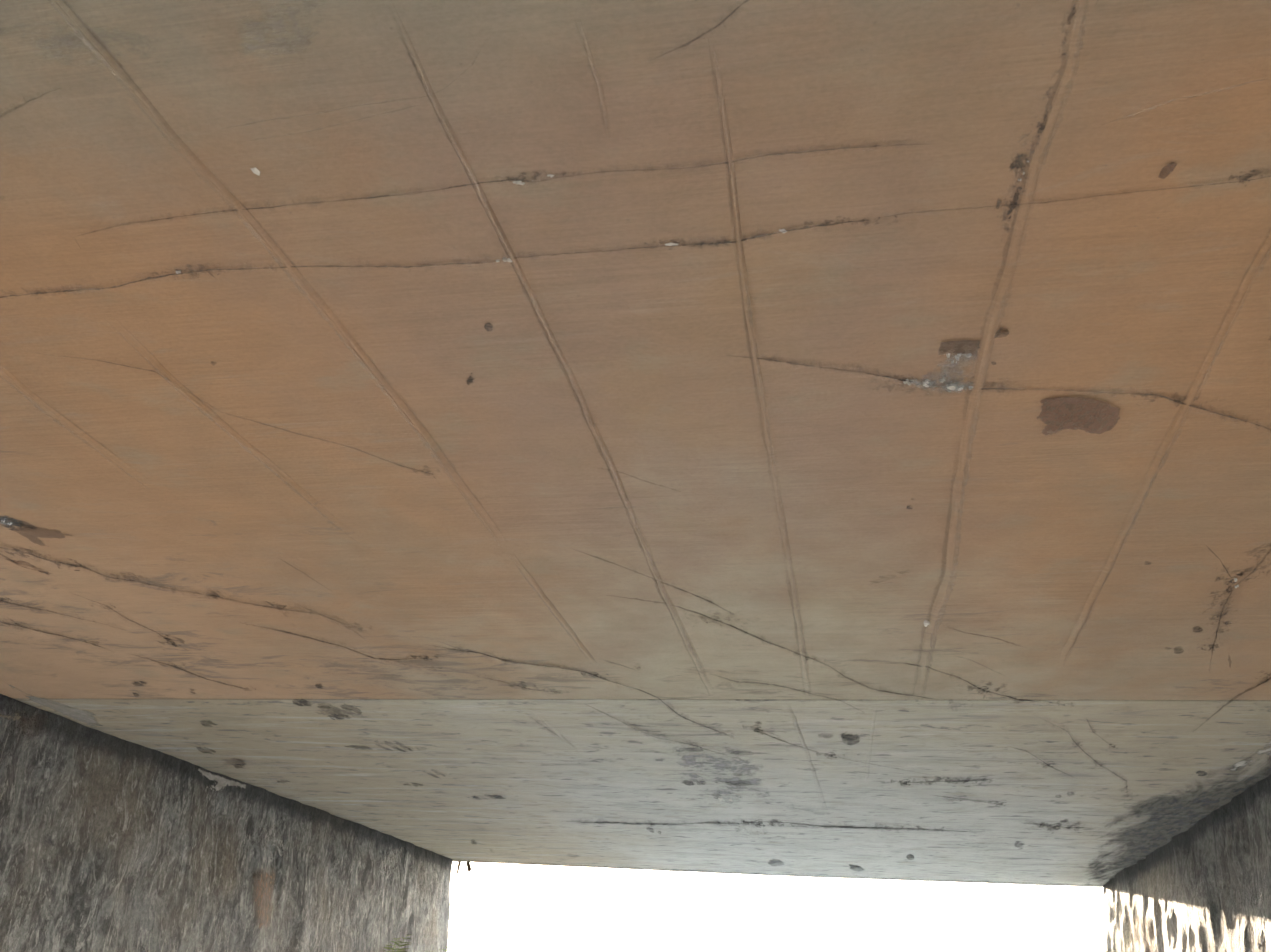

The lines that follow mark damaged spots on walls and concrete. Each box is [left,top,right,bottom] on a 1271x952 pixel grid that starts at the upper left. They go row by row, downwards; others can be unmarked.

crack [455,174,554,187]
crack [665,223,838,246]
crack [376,258,513,268]
spalling [915,340,980,392]
crack [884,376,1002,391]
water stain [1037,397,1120,435]
spalling [0,517,68,544]
crack [1209,550,1243,649]
crack [595,712,938,831]